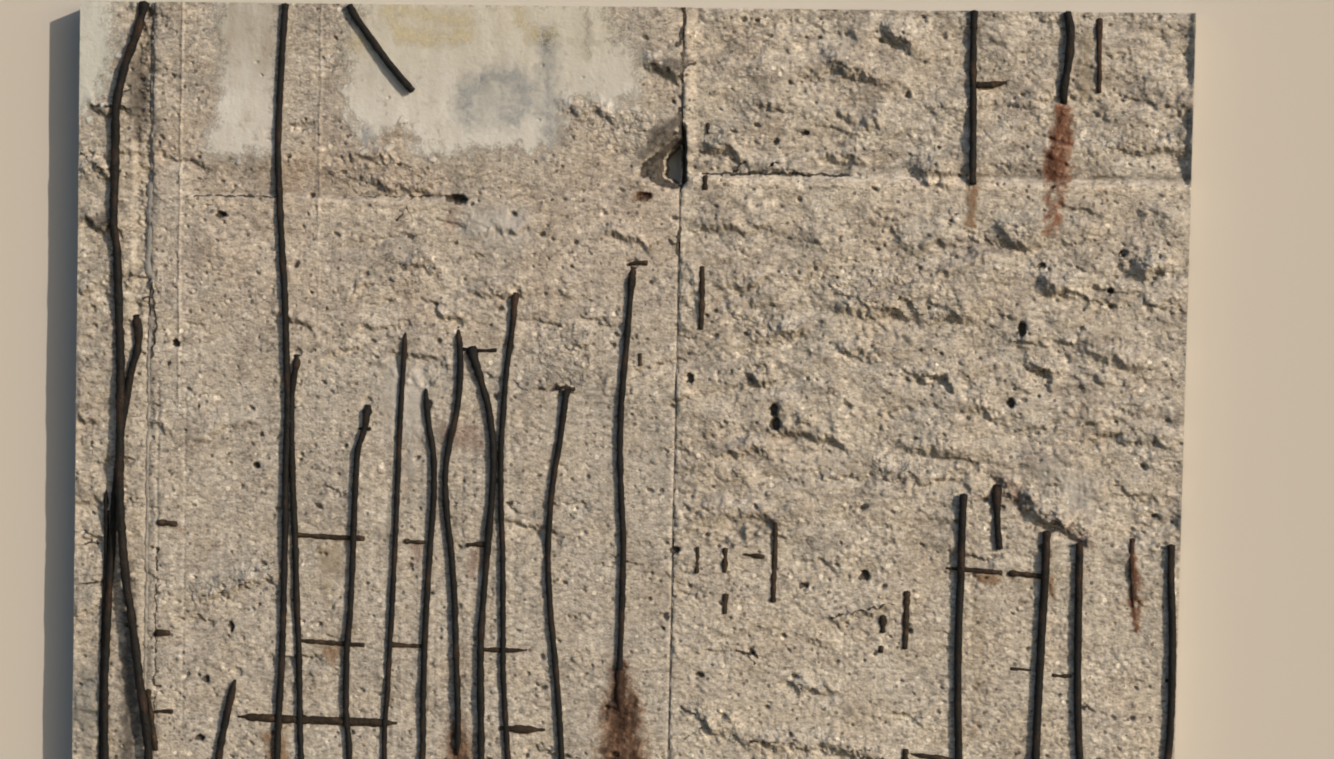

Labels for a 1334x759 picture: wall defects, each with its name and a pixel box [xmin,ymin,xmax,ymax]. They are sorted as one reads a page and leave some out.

peeling [324,4,752,205]
rust [1042,104,1075,236]
rust [1127,554,1144,633]
rust [441,719,492,759]
rust [595,660,650,759]